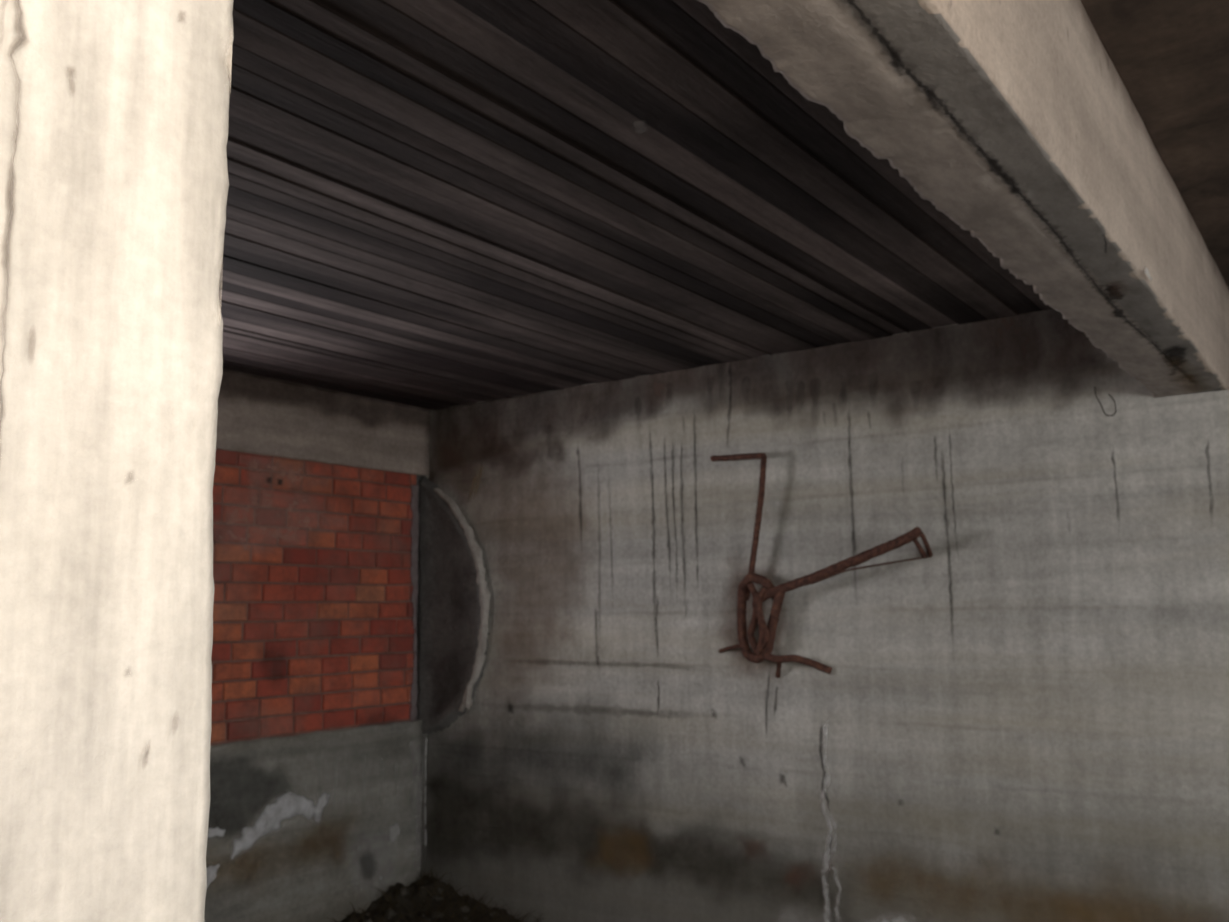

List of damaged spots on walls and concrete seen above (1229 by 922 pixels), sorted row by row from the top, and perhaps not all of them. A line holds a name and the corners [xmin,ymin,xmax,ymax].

crack [11,0,25,57]
crack [6,148,16,270]
crack [0,366,8,422]
leakage [429,309,1104,482]
rust [710,453,933,678]
leakage [209,772,283,830]
leakage [425,775,744,881]
crack [819,728,840,922]